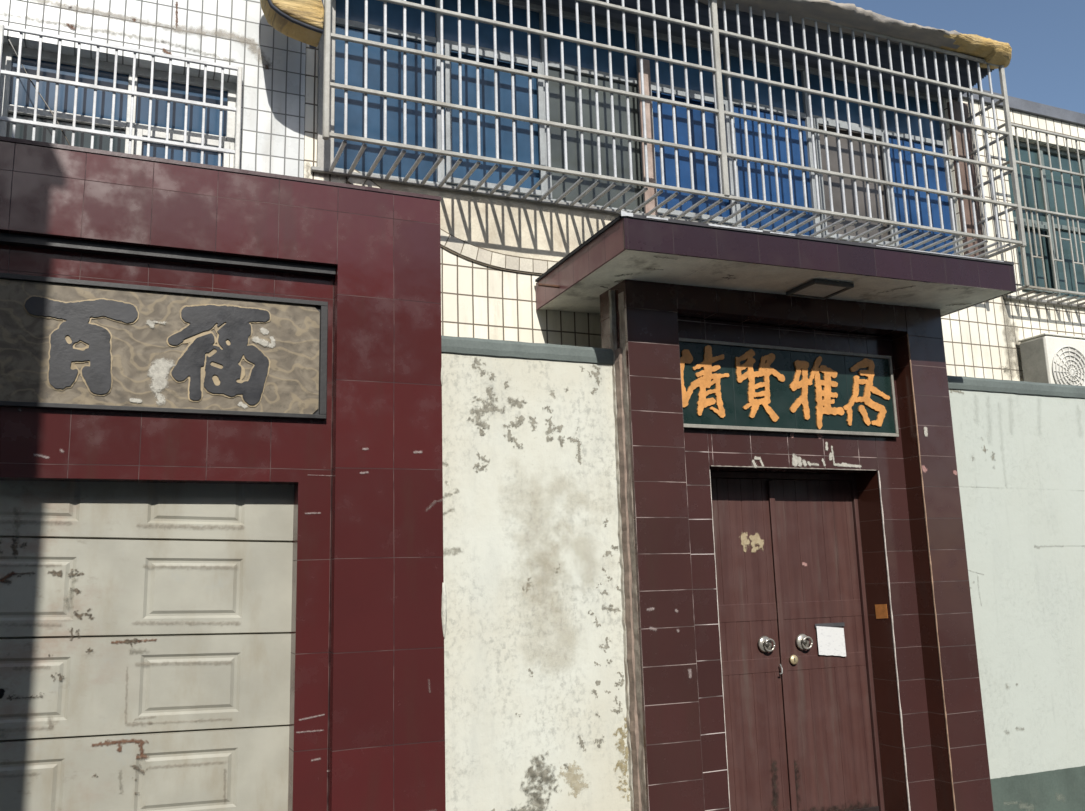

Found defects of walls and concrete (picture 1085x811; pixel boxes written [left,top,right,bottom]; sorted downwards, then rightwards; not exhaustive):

peeling [252,328,275,348]
peeling [147,358,175,404]
peeling [468,358,581,463]
spalling [792,434,862,468]
rust [48,569,84,594]
peeling [578,545,630,801]
rust [92,739,147,794]
flaking render [511,754,588,811]